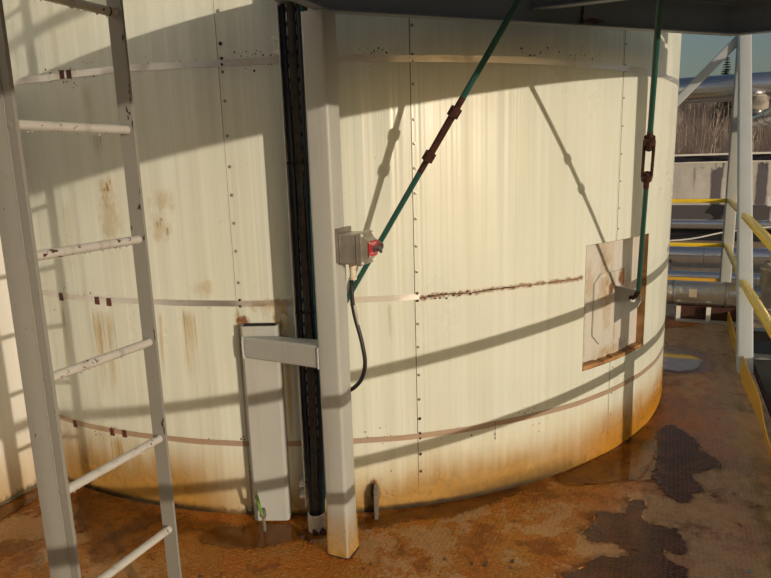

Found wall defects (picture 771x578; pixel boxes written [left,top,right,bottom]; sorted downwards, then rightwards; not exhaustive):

water stain [662,345,716,375]
corrosion [582,383,662,464]
peeling [650,425,725,504]
peeling [558,499,694,578]